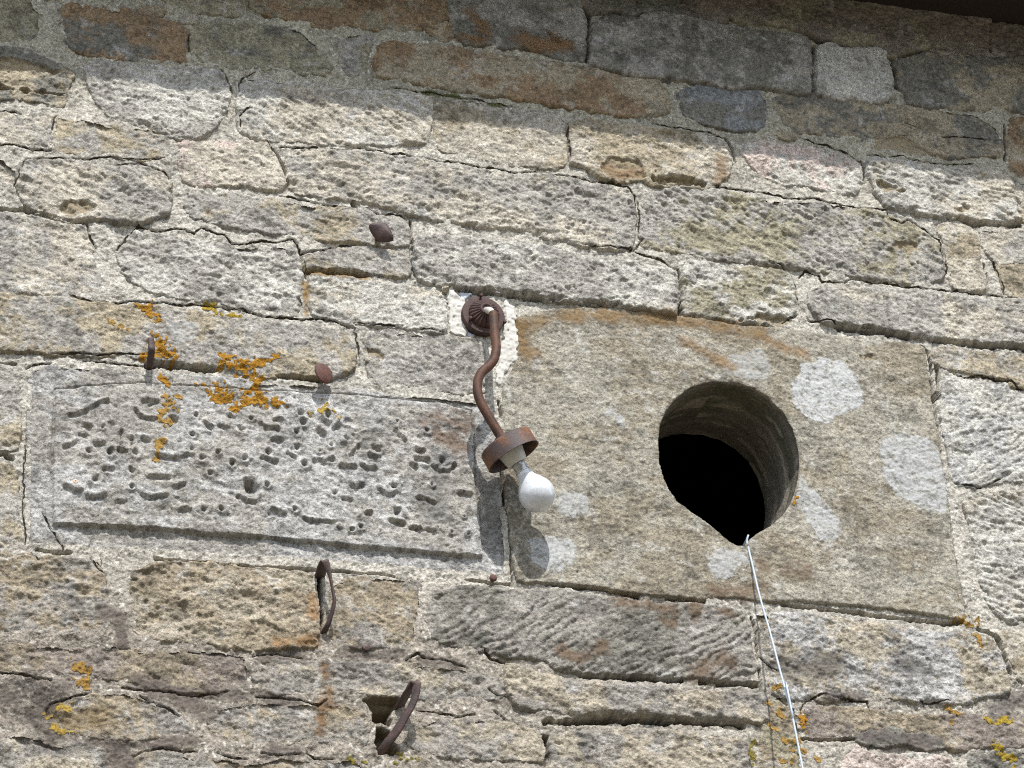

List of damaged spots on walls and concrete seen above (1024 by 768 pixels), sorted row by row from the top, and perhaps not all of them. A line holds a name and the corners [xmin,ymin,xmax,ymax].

crack [22,448,64,550]